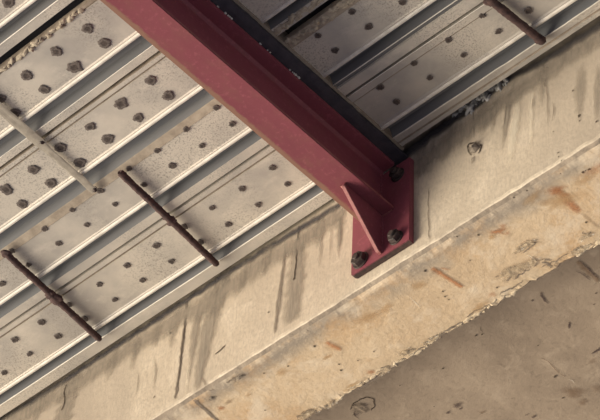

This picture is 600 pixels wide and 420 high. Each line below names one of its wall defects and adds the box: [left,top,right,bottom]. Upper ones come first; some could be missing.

rust [483,0,546,45]
leakage [403,21,600,174]
rust [0,250,102,342]
rust [118,170,219,267]
leakage [0,204,344,420]
spalling [496,259,552,288]
spalling [570,232,600,257]
spalling [297,335,438,420]